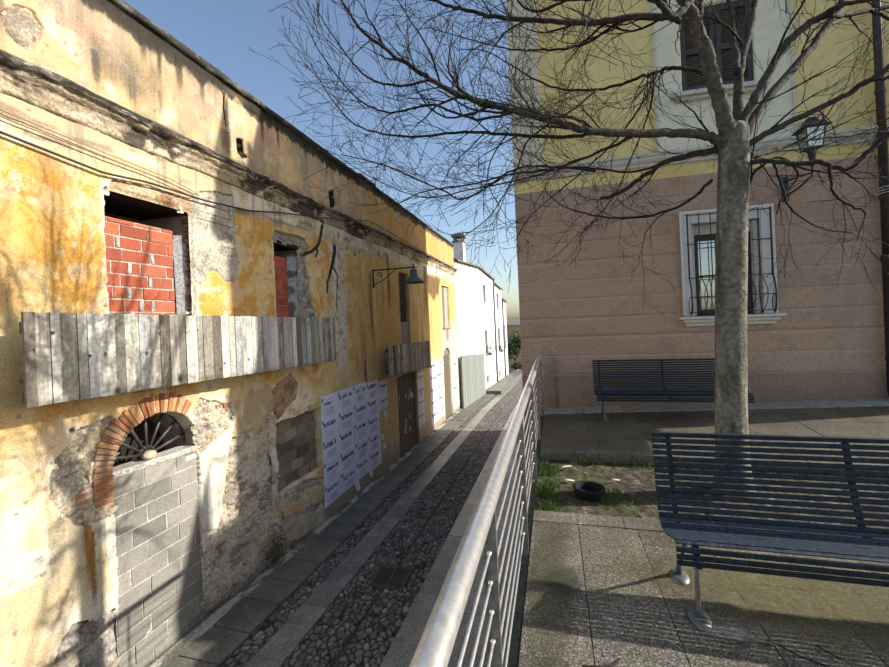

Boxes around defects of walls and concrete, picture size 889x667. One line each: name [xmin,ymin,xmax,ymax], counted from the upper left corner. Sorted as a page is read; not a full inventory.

spalling [0,5,42,51]
water stain [97,0,223,88]
peeling [102,179,238,315]
spalling [49,416,121,667]
corrosion [81,523,96,593]
spalling [190,373,325,618]